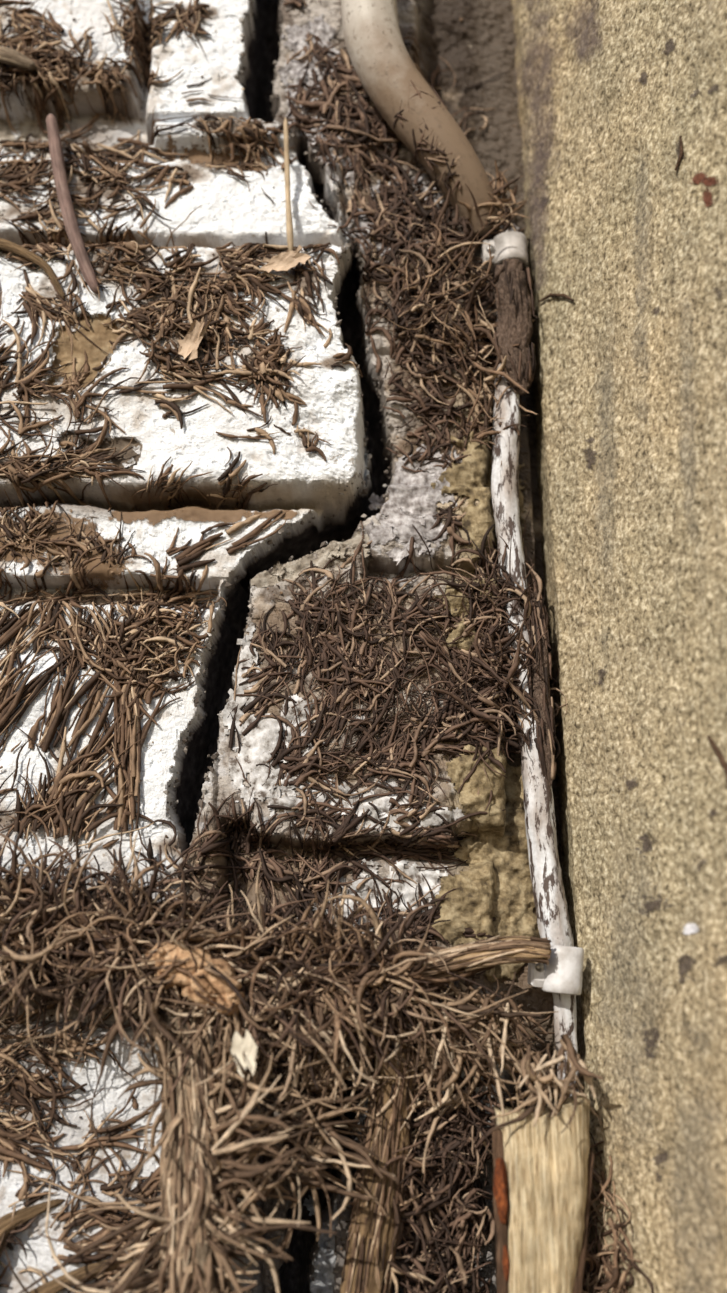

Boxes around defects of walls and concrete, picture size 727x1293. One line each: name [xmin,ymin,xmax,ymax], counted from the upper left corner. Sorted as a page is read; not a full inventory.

crack [234,0,282,122]
crack [163,145,392,849]
crack [268,1059,366,1293]